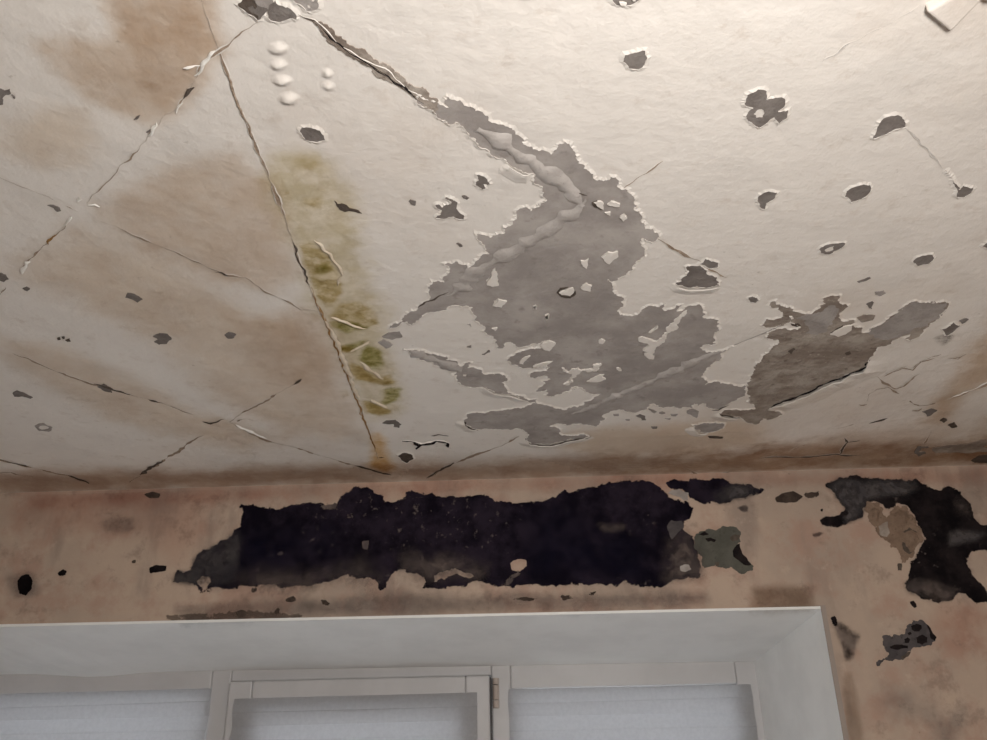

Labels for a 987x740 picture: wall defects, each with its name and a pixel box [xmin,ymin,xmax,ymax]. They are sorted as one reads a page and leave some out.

peeling [234,0,324,26]
crack [298,14,439,114]
crack [0,0,390,484]
peeling [378,86,969,449]
crack [760,354,987,459]
crack [402,434,519,479]
spalling [693,526,753,574]
spalling [864,501,924,570]
spalling [876,620,936,666]